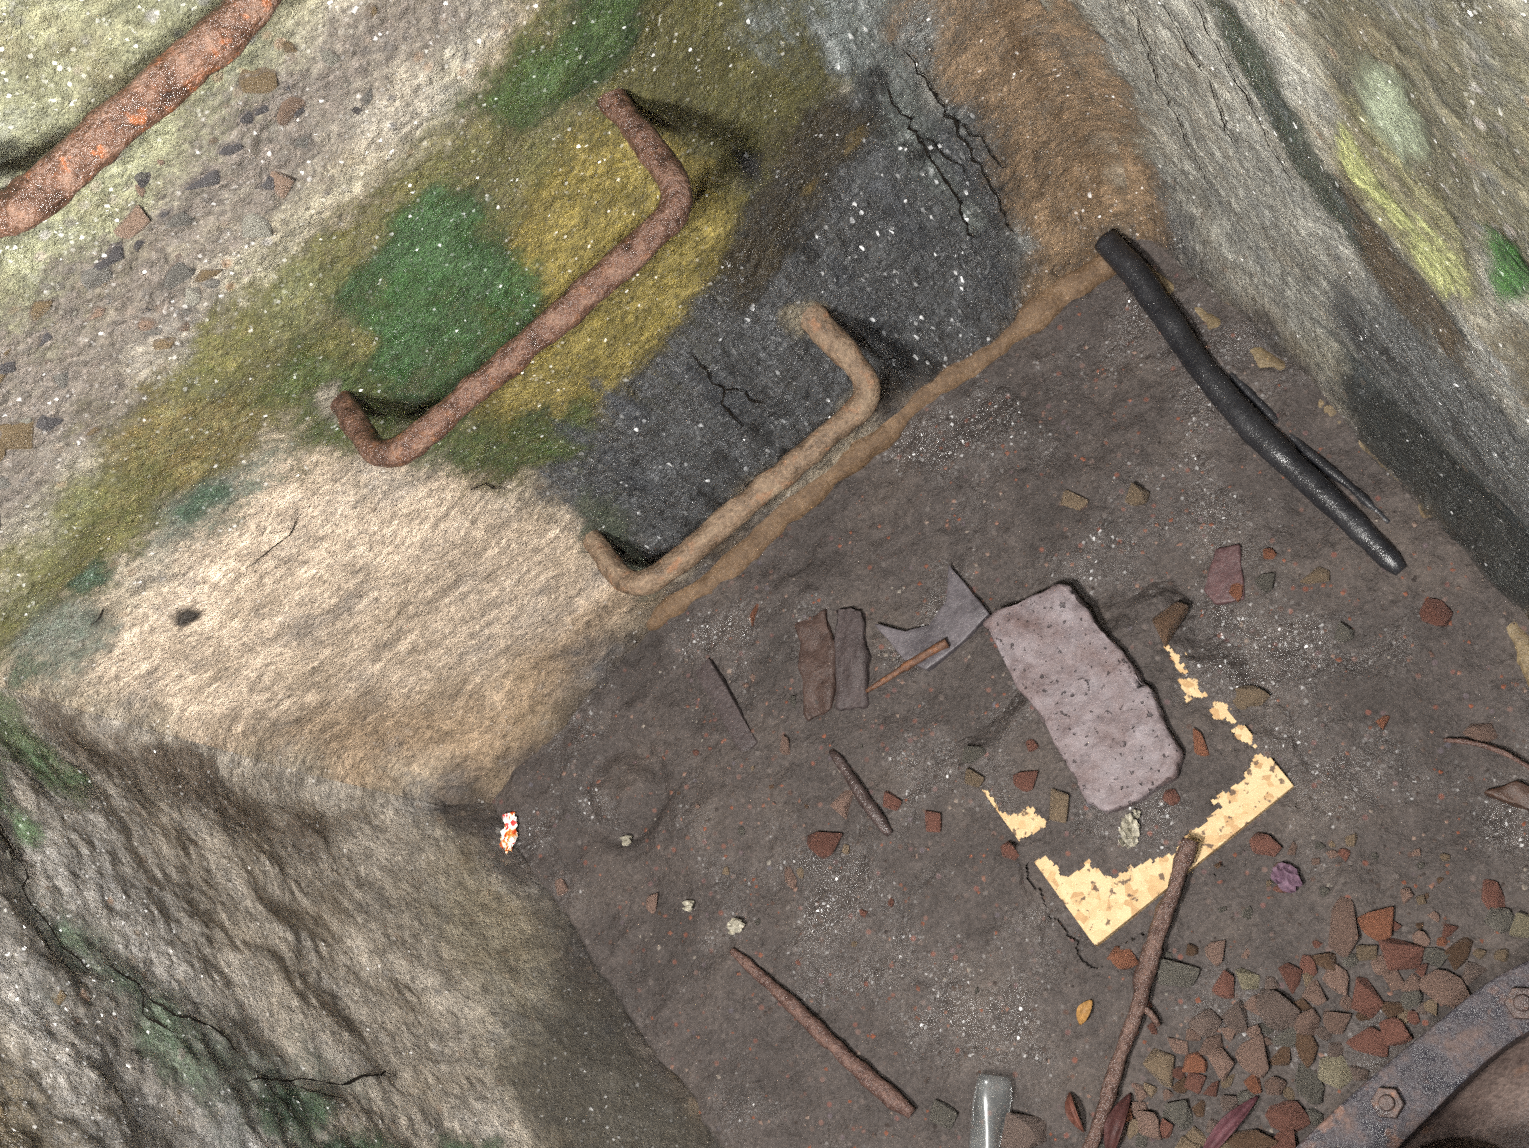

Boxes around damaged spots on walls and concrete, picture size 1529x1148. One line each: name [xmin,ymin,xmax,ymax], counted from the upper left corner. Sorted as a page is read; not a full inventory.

leakage [1331,65,1529,608]
leakage [32,704,327,855]
crack [0,799,396,1098]